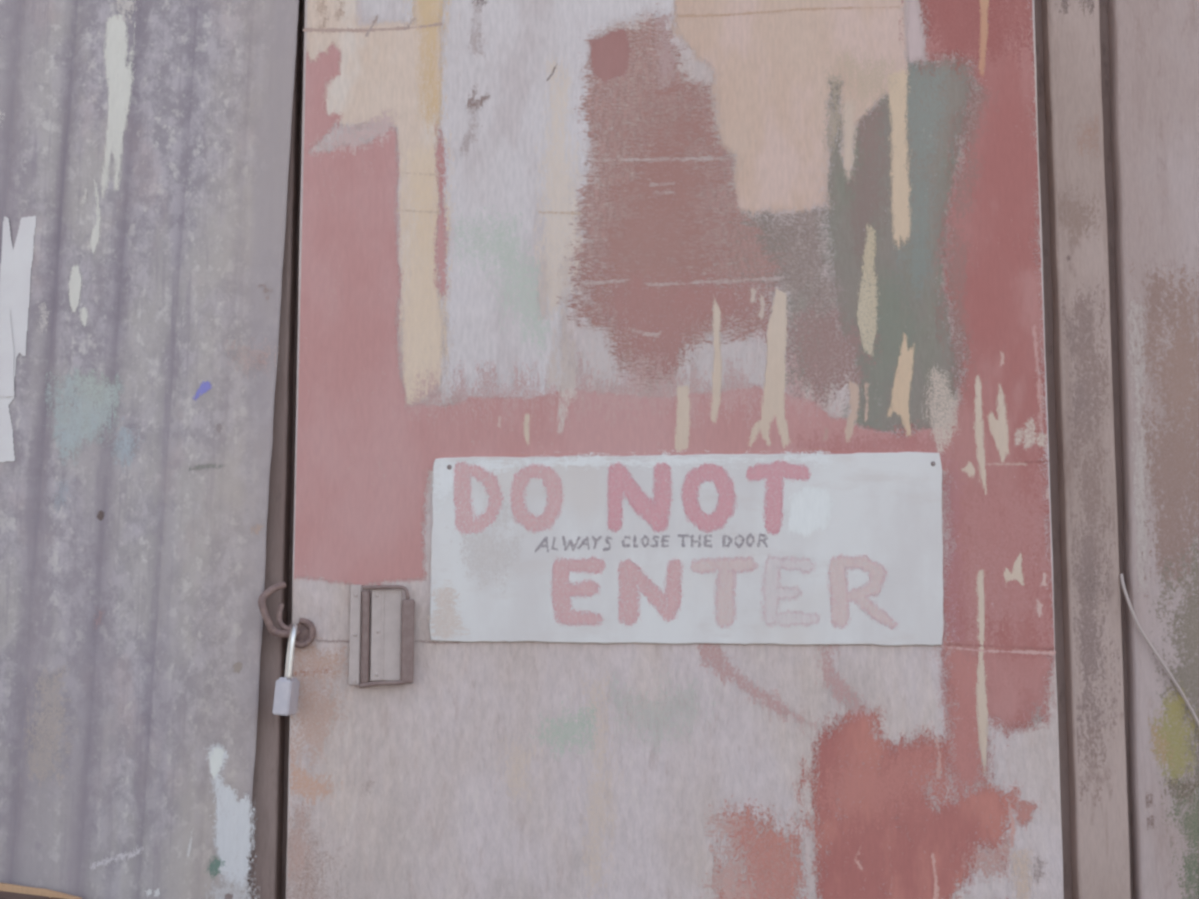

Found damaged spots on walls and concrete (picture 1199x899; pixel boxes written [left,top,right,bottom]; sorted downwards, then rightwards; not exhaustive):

leakage [1130,253,1199,801]